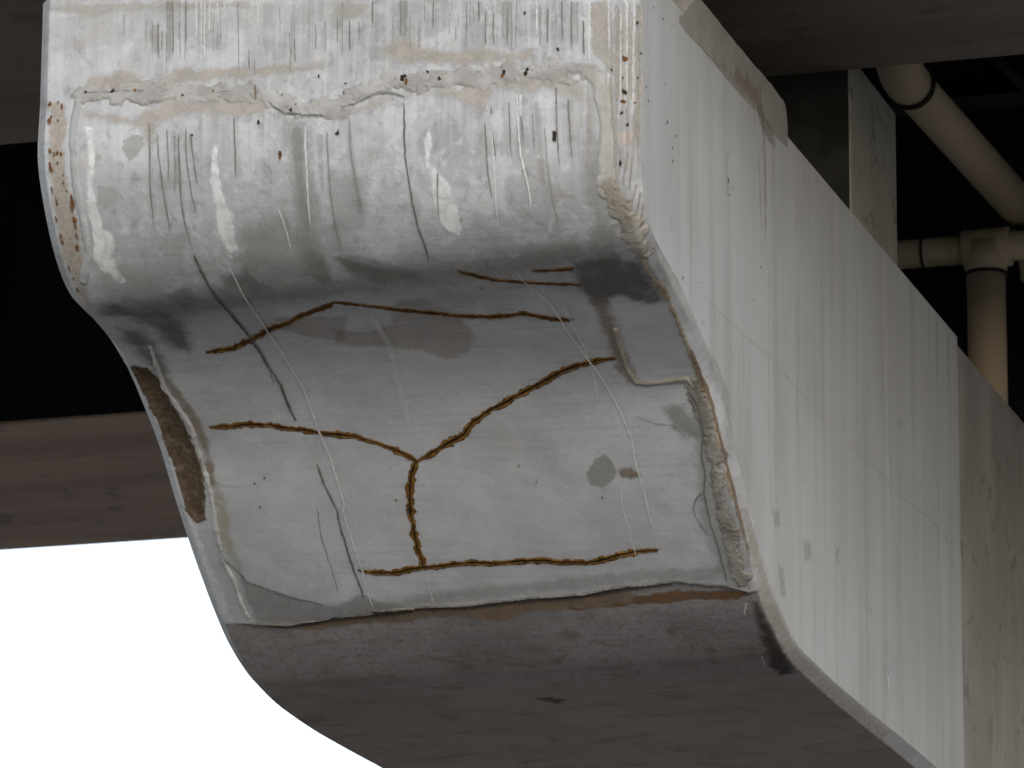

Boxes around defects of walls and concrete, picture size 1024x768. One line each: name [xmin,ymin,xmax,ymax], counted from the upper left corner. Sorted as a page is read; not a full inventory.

rust [47,101,90,304]
damp [83,97,266,246]
crack [269,91,429,260]
spalling [110,338,232,622]
damp [107,241,660,606]
crack [160,254,659,605]
spalling [587,455,616,487]
rust [266,584,749,631]